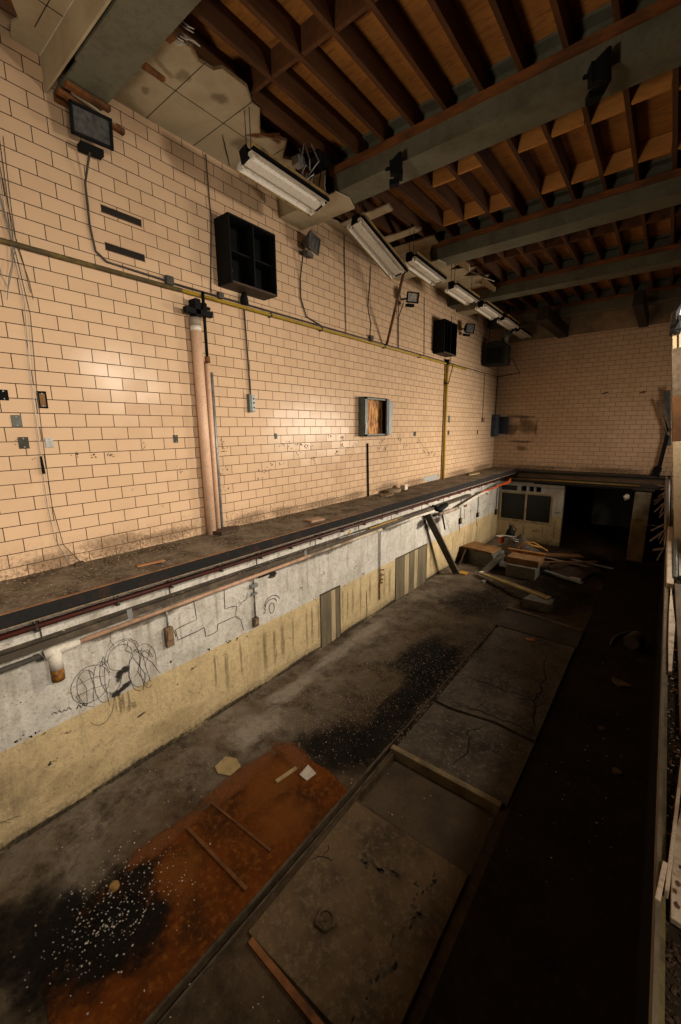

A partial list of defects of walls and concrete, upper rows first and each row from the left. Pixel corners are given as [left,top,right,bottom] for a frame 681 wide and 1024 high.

damp [203,594,406,749]
crack [453,654,548,764]
corrosion [129,742,310,868]